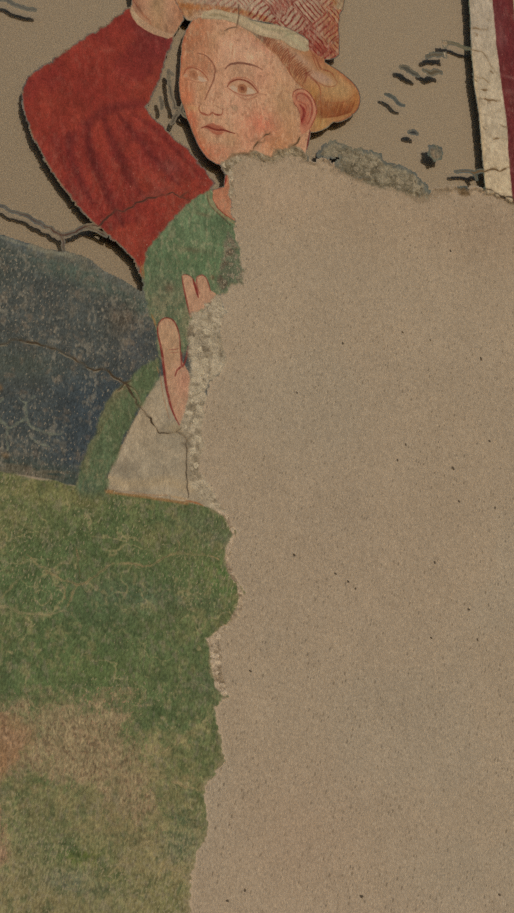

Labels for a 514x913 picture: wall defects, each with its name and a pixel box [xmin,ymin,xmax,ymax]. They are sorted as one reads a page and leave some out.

crack [0,190,192,252]
flaking render [219,139,431,201]
crack [0,337,191,500]
flaking render [178,230,247,699]